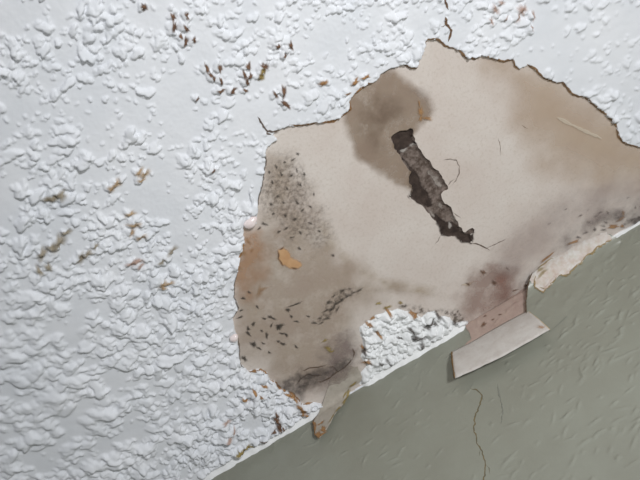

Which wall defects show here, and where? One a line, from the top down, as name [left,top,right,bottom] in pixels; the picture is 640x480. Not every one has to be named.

damp [346,72,430,187]
peeling [233,38,640,438]
damp [284,341,355,394]
crack [472,387,503,480]